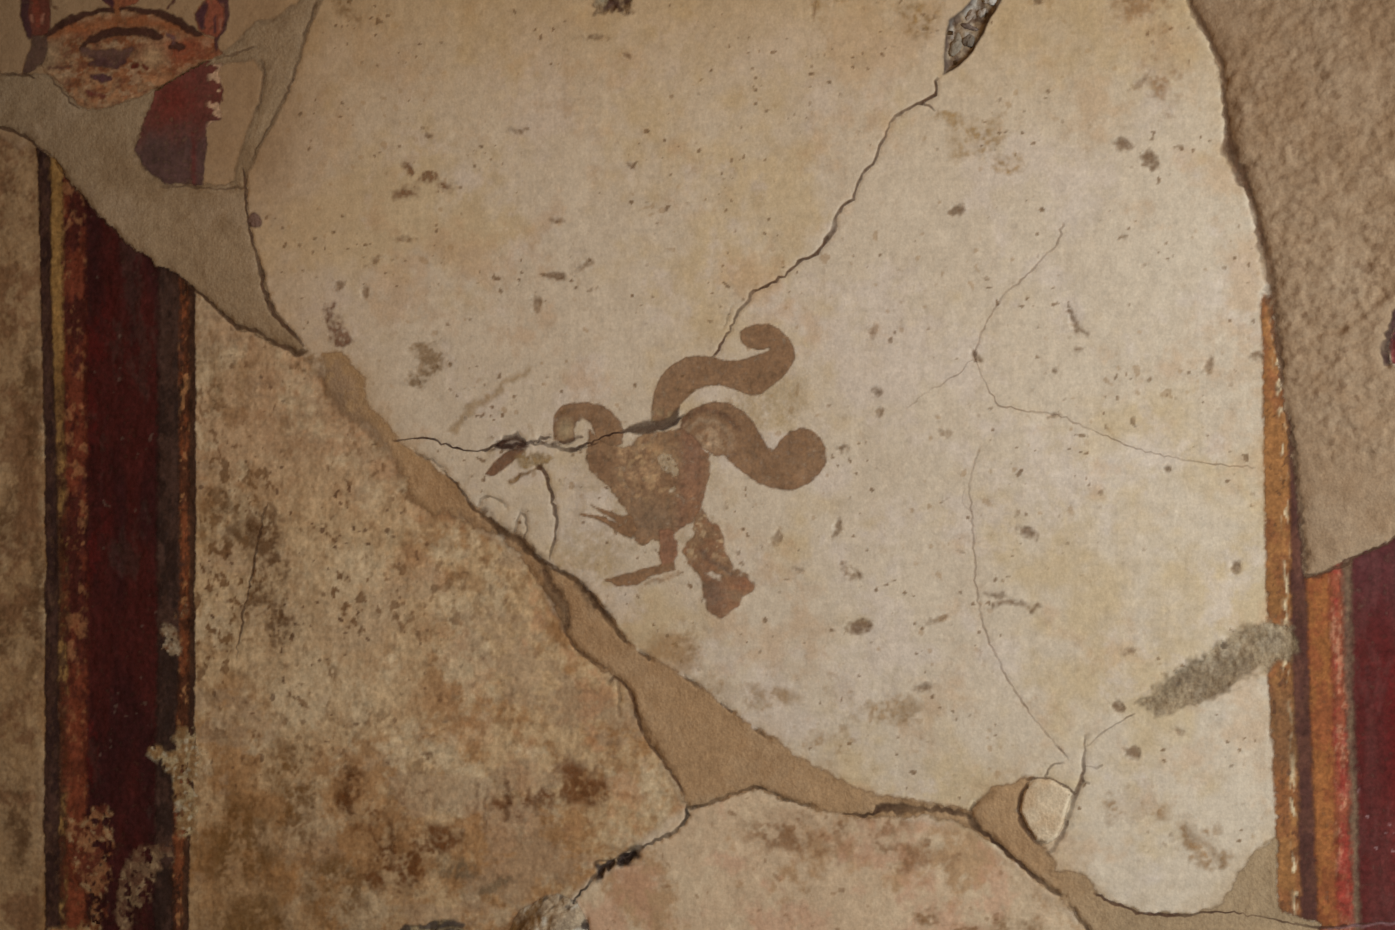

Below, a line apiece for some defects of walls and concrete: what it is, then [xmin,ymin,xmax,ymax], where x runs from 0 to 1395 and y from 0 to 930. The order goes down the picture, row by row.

spalling [593,0,632,14]
spalling [944,0,1001,74]
crack [714,80,938,355]
spalling [623,408,679,434]
crack [662,417,681,431]
crack [405,432,625,642]
spalling [1113,623,1298,716]
flaking render [1019,778,1086,844]
spalling [596,851,639,880]
crack [1096,894,1237,917]
spalling [401,920,464,930]
crack [1279,920,1358,929]